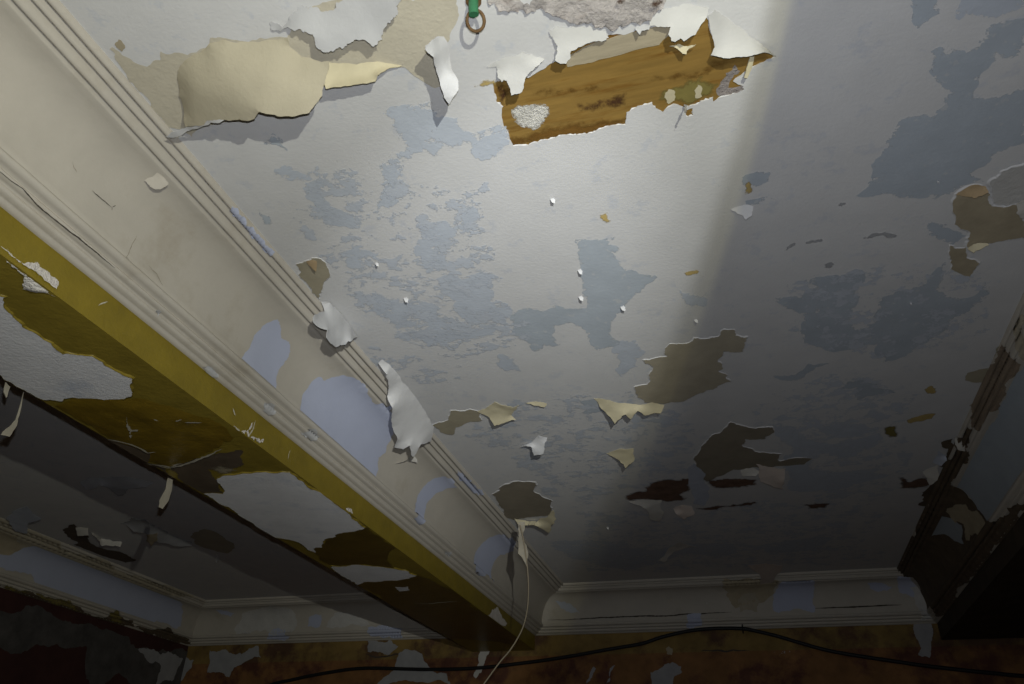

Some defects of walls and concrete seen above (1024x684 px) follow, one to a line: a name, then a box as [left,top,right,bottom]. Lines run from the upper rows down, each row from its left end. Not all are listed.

peeling [110,0,459,138]
flaking render [487,0,776,95]
peeling [774,18,1024,381]
peeling [274,102,749,476]
peeling [0,294,135,437]
peeling [159,450,519,684]
peeling [414,471,556,581]
peeling [693,421,812,482]
peeling [897,314,1024,658]